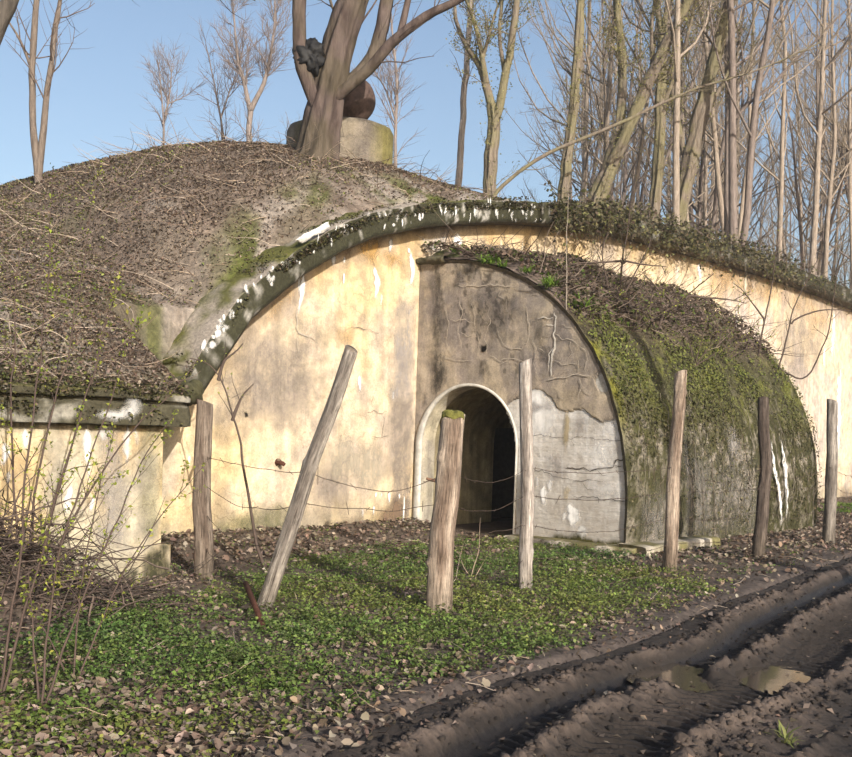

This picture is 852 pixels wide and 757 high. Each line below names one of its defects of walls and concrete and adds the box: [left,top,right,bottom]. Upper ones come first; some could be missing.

leakage [434,355,443,393]
crack [445,283,600,400]
spalling [505,399,521,534]
spalling [532,390,625,543]
leakage [772,446,789,516]